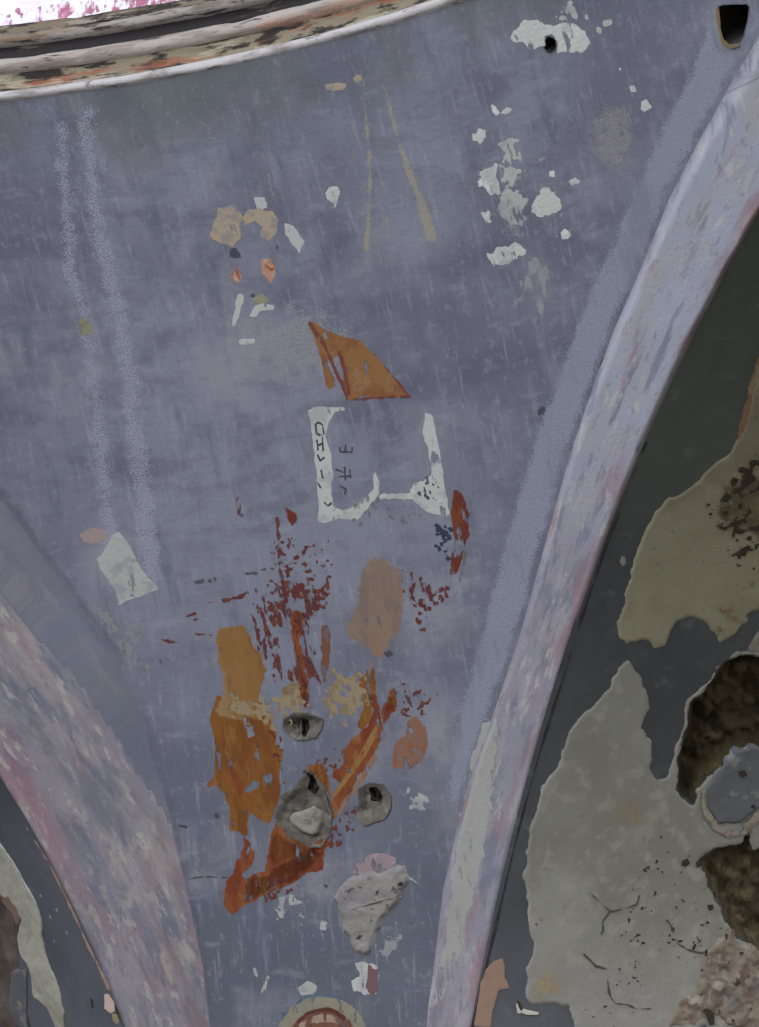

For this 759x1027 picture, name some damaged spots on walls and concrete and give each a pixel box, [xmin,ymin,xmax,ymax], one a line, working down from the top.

peeling [511,0,612,53]
peeling [472,128,486,144]
peeling [477,138,571,314]
flaking render [617,358,759,648]
flaking render [80,528,158,671]
spalling [282,712,323,741]
spalling [274,770,333,848]
spalling [356,783,392,826]
crack [471,442,651,1027]
flaking render [516,631,759,1027]
peeling [0,843,65,1027]
peeling [474,958,509,1027]